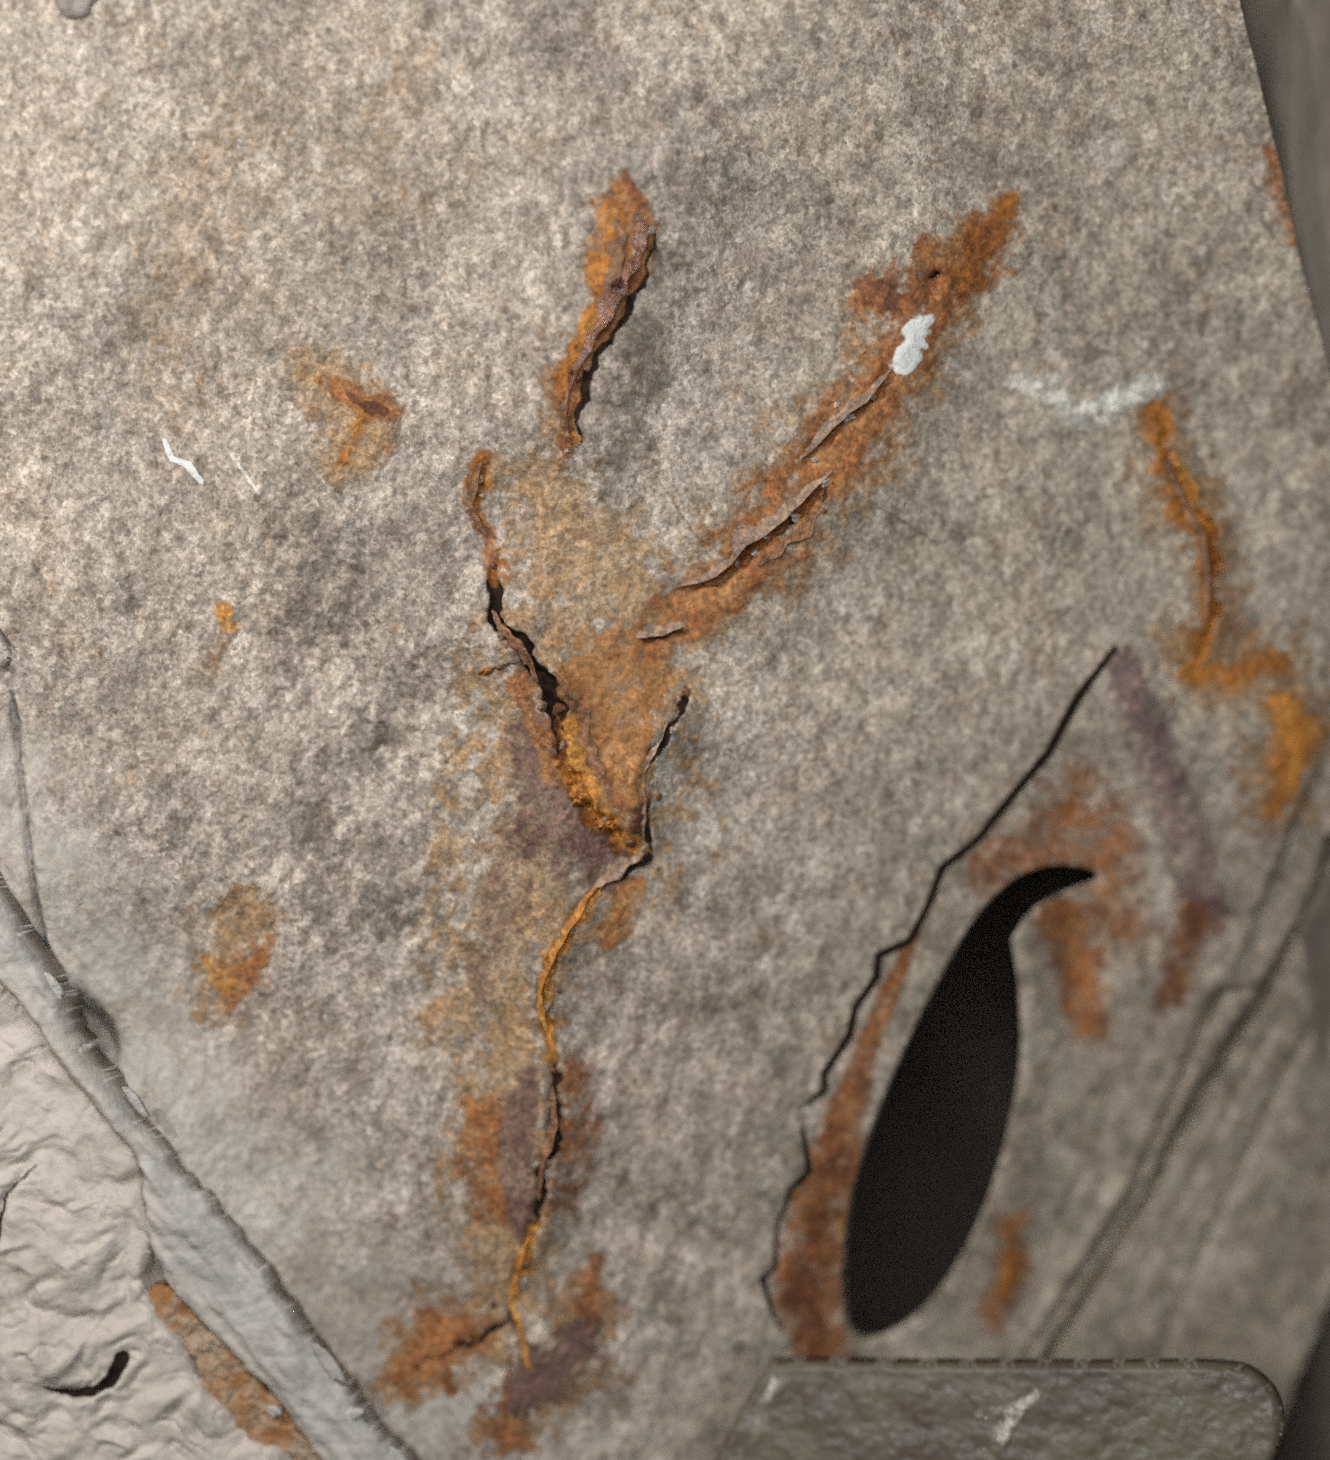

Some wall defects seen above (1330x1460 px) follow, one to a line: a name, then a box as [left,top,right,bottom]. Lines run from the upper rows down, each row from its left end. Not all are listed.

rust [290,345,403,487]
crack [539,172,659,469]
crack [634,233,1000,654]
rust [848,193,1018,316]
rust [1153,615,1330,836]
rust [190,884,287,1026]
rust [367,433,726,1458]
crack [412,450,691,1371]
crack [759,646,1118,1334]
rust [149,1281,321,1460]
rust [773,932,919,1357]
rust [981,1211,1030,1331]